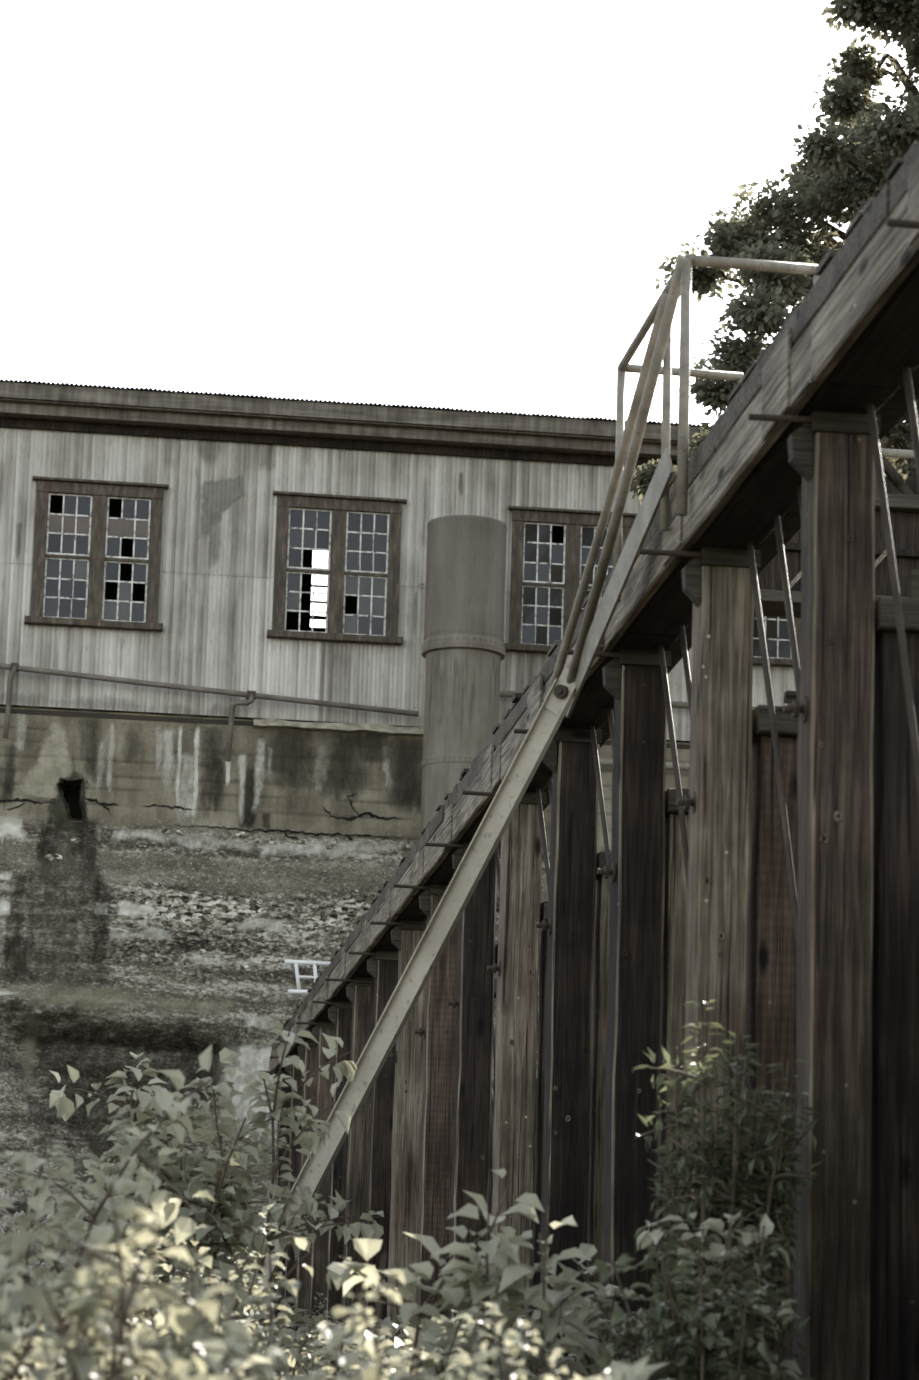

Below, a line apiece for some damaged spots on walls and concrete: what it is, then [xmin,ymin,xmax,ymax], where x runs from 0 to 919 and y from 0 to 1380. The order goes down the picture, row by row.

crack [0,797,49,810]
peeling [17,722,87,860]
leakage [0,716,423,860]
crack [84,793,413,841]
leakage [94,883,170,953]
leakage [215,919,283,932]